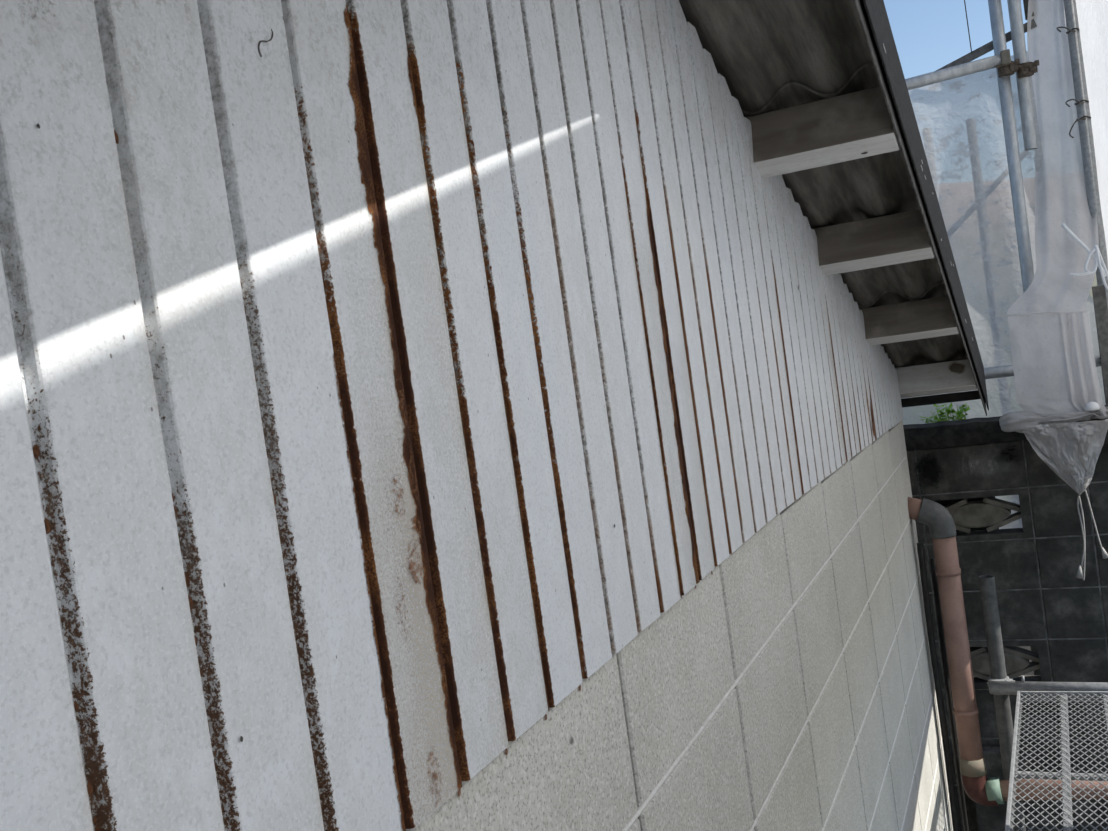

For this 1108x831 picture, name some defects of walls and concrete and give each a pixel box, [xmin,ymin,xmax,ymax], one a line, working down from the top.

rust [7,246,117,831]
rust [159,415,241,831]
rust [295,5,470,831]
rust [407,36,516,755]
rust [511,175,588,691]
rust [647,518,664,613]
rust [618,110,883,597]